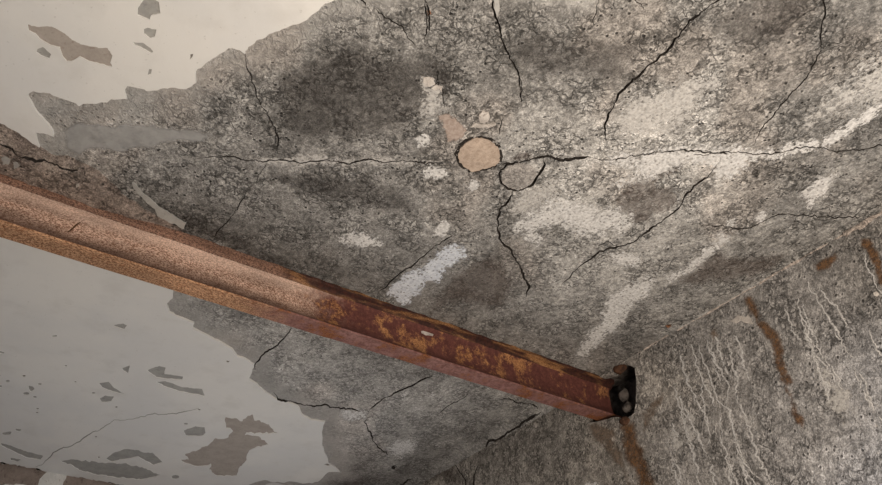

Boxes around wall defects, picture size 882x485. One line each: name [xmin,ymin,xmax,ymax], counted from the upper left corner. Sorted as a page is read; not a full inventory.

crack [361,0,431,45]
efflorescence [419,77,444,117]
crack [198,54,452,237]
damp [249,153,448,180]
damp [414,134,431,148]
peeling [28,0,882,376]
crack [492,0,882,296]
rust [862,239,882,284]
rust [746,297,792,383]
peeling [167,290,555,485]
peeling [62,449,162,479]
rust [590,416,654,485]